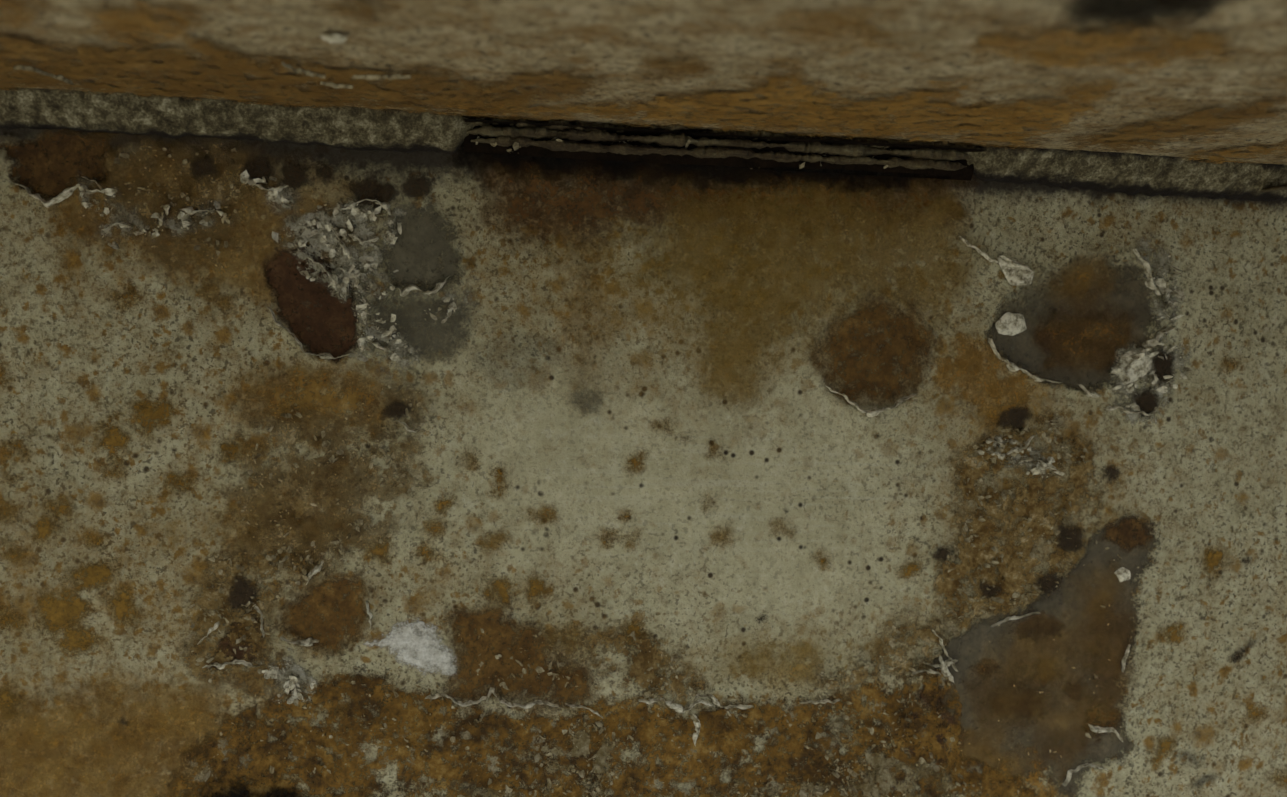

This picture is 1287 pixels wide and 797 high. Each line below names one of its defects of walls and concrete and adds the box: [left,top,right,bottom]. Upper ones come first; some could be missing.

peeling [0,129,479,370]
peeling [810,295,937,418]
peeling [958,236,1192,417]
corrosion [94,396,174,479]
corrosion [0,493,72,544]
corrosion [0,535,139,657]
corrosion [479,572,554,608]
peeling [737,407,1160,797]
corrosion [153,666,1060,797]